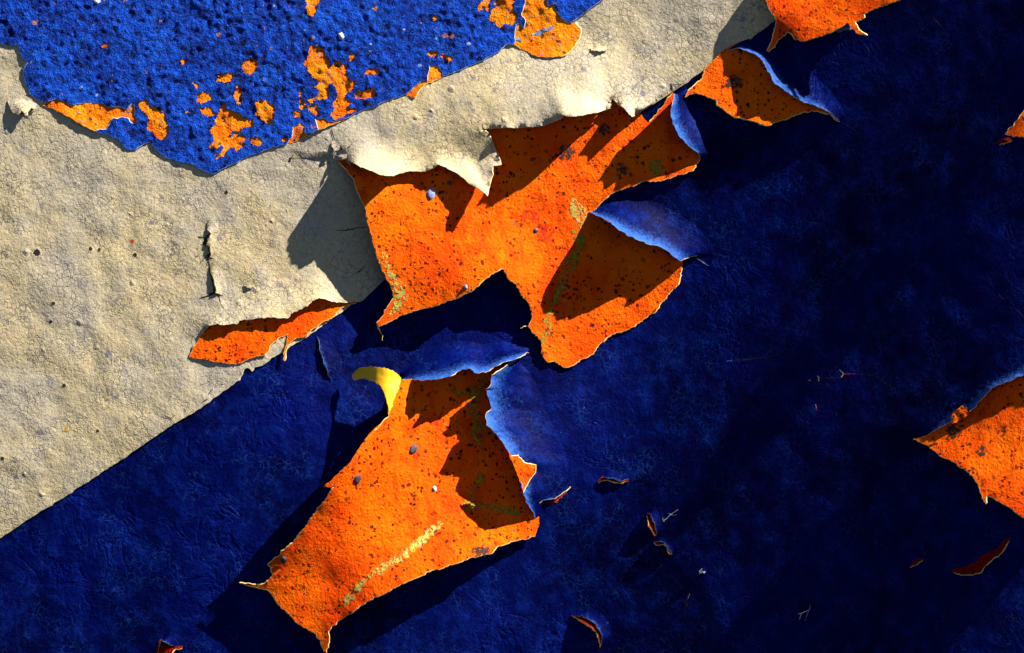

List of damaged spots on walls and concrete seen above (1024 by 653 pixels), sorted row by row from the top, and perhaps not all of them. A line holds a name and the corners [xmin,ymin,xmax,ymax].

peeling [7,98,170,140]
crack [198,220,228,303]
peeling [183,0,900,653]
peeling [909,343,1024,518]